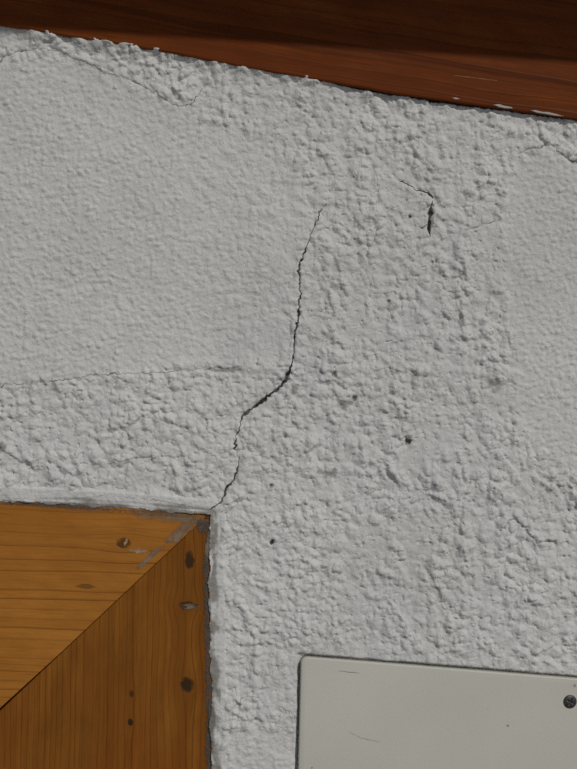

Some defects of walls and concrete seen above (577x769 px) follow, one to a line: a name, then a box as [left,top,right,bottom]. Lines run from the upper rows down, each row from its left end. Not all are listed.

crack [211,205,325,509]
crack [400,181,433,237]